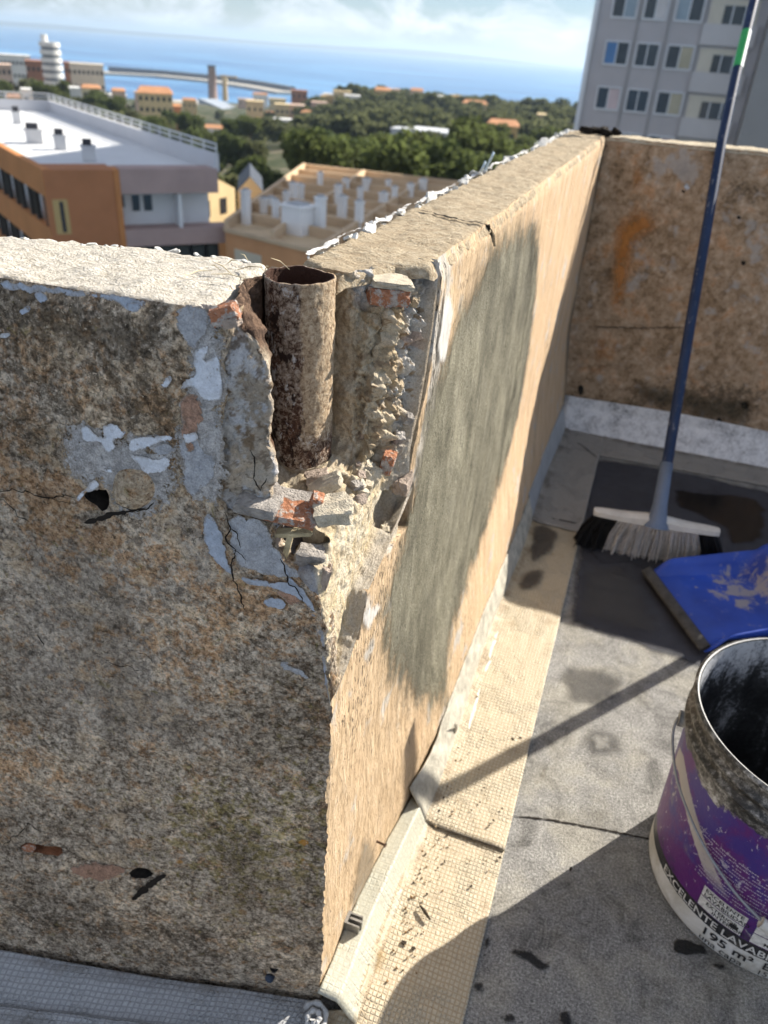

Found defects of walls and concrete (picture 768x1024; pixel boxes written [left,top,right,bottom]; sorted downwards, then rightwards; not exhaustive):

crack [418,209,489,226]
spalling [62,129,574,706]
crack [250,450,267,491]
crack [0,488,74,522]
crack [225,513,245,610]
crack [280,558,303,602]